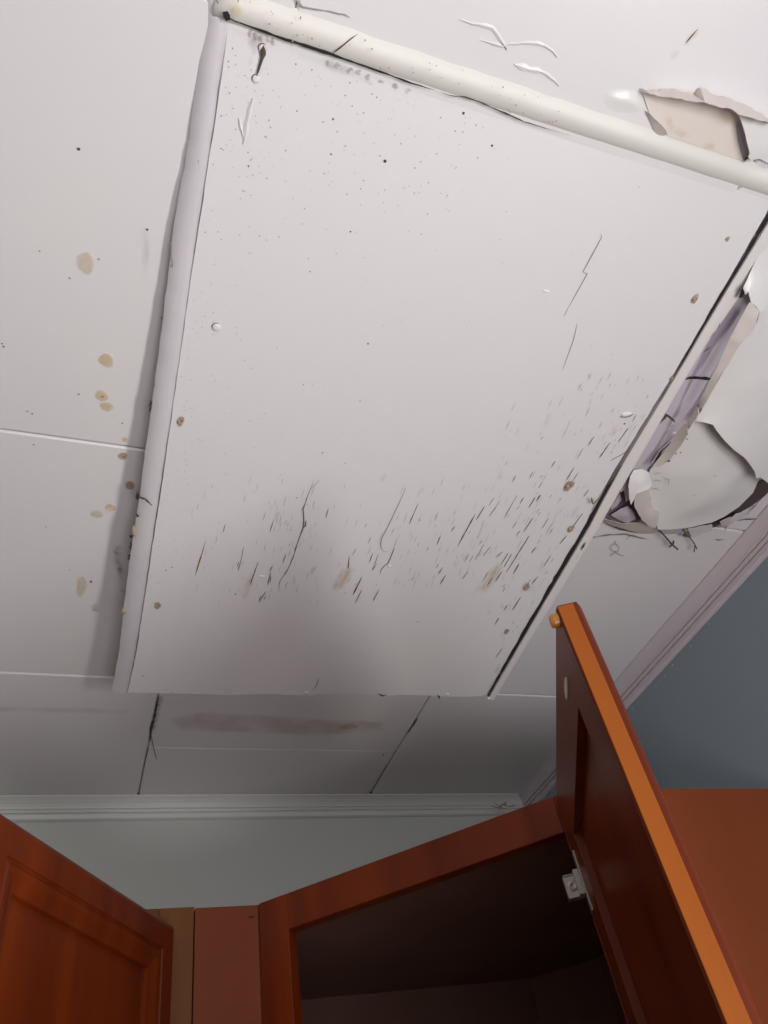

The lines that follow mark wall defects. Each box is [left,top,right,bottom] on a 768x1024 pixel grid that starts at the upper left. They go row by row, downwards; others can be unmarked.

crack [216,0,567,135]
peeling [642,88,768,163]
crack [195,213,768,696]
peeling [620,246,768,538]
crack [139,697,159,790]